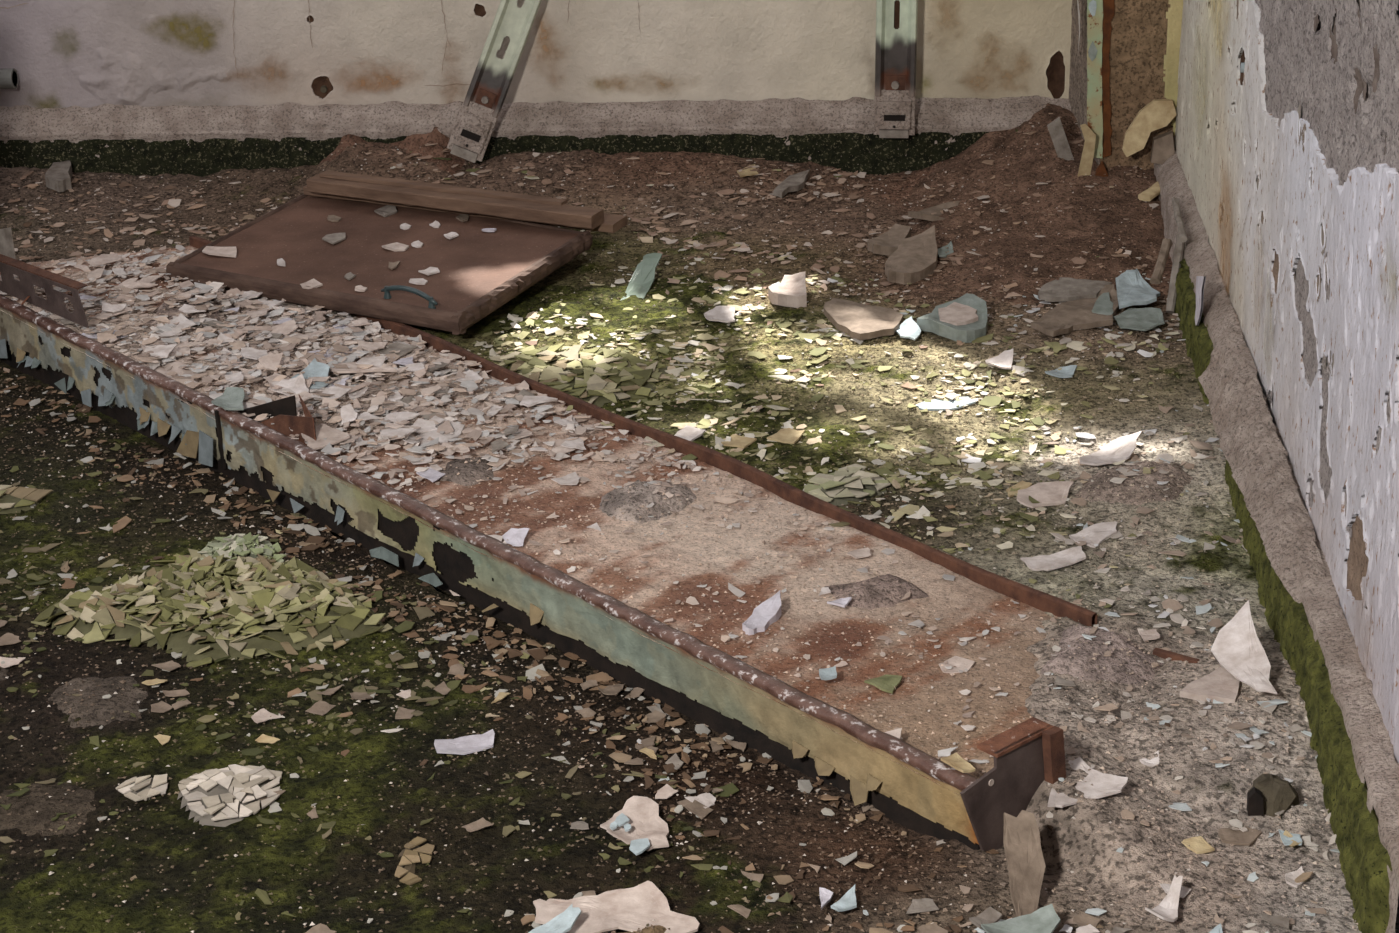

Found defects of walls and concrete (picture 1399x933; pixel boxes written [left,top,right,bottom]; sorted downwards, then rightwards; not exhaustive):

peeling [1236,0,1399,189]
peeling [1116,269,1160,309]
peeling [704,306,735,323]
spalling [1198,211,1369,603]
peeling [482,406,586,458]
peeling [675,425,705,441]
peeling [721,428,805,449]
peeling [1006,480,1074,508]
peeling [502,528,529,547]
peeling [1021,522,1118,571]
peeling [434,729,495,755]
peeling [600,796,669,856]